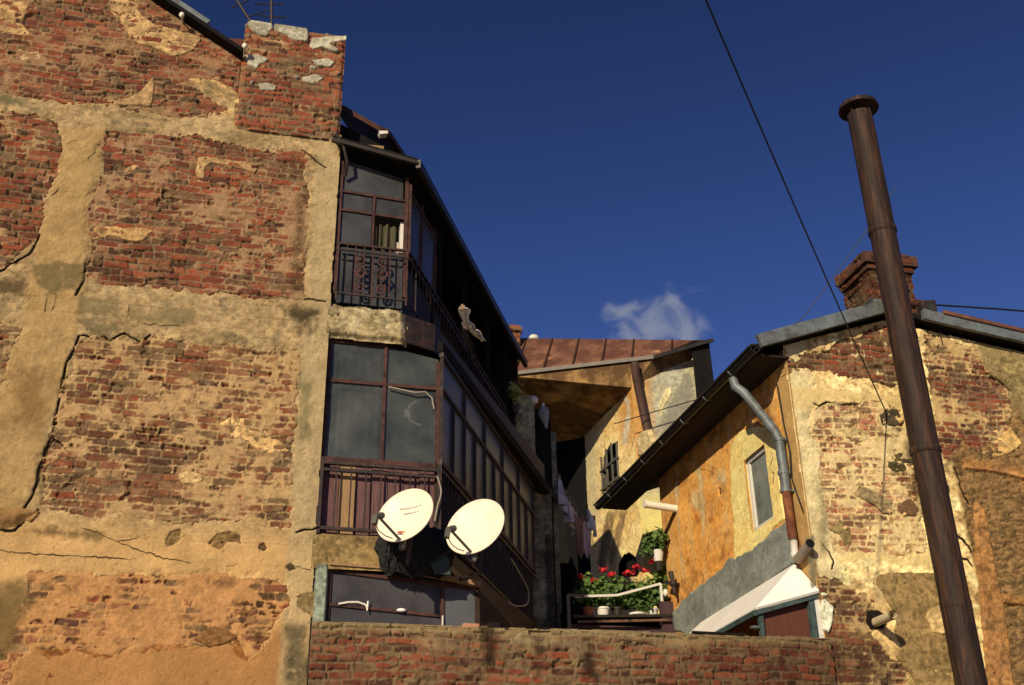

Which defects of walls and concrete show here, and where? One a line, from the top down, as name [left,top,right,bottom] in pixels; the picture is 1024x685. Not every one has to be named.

flaking render [0,0,277,122]
crack [0,234,40,271]
flaking render [0,111,63,268]
flaking render [84,130,311,301]
crack [0,304,190,563]
flaking render [39,335,302,552]
flaking render [787,326,898,388]
flaking render [809,399,927,559]
flaking render [923,335,1024,461]
flaking render [0,571,315,685]